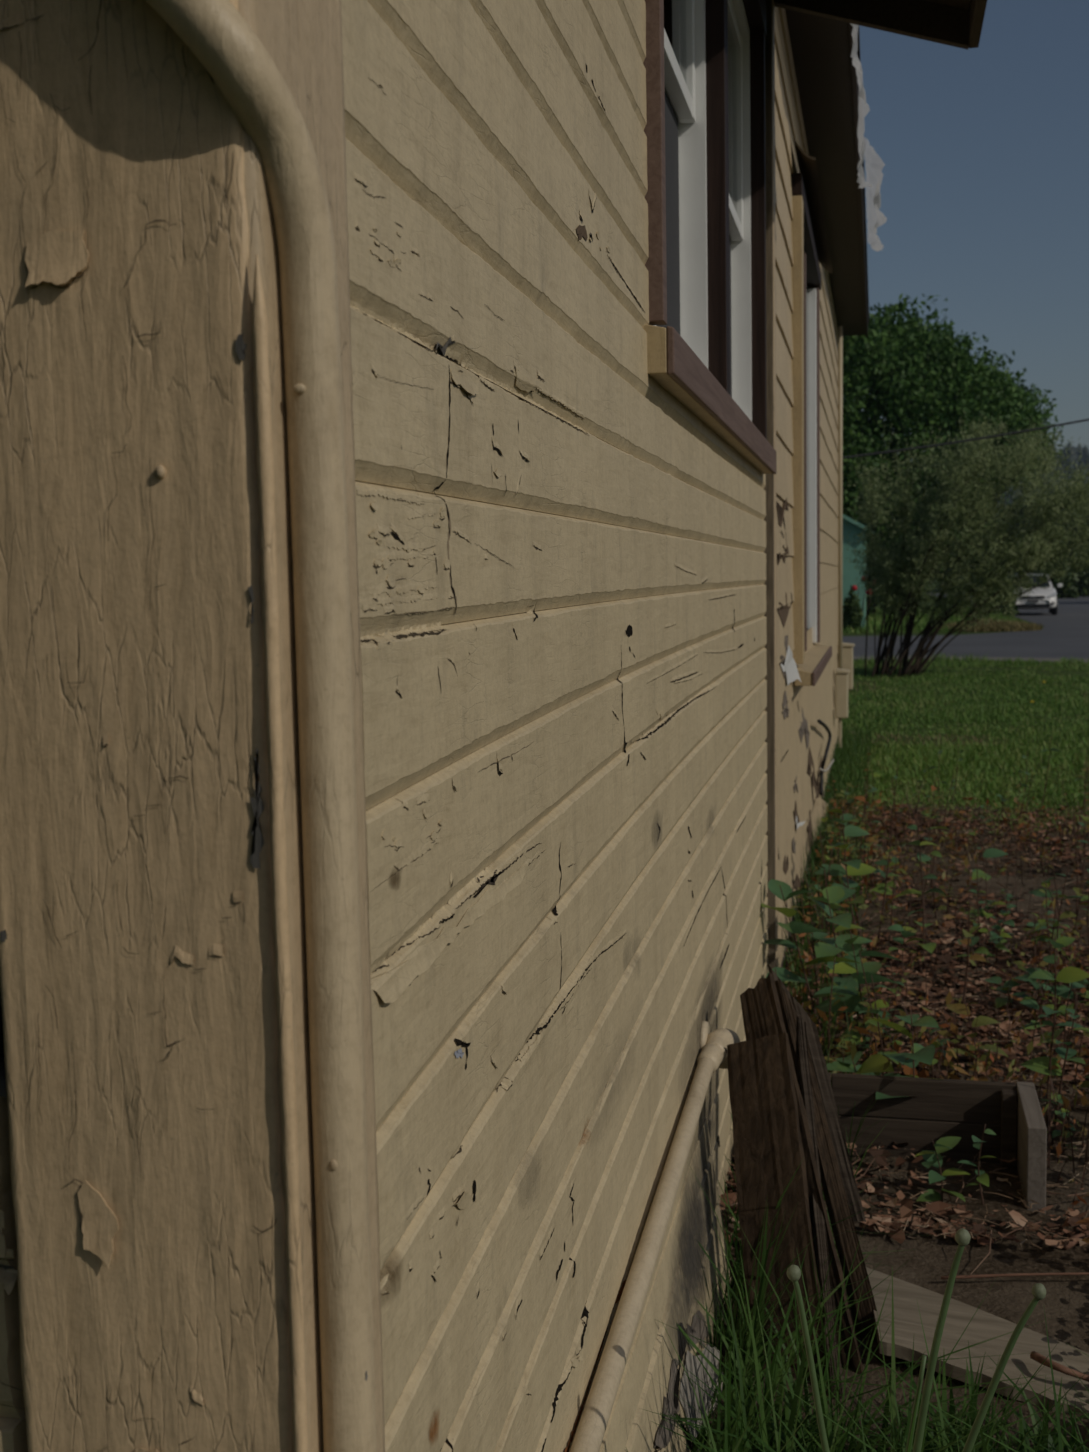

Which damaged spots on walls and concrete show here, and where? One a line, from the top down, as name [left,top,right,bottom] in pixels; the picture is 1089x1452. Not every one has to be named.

peeling [576,192,645,312]
crack [108,219,183,610]
peeling [350,300,495,406]
peeling [357,484,453,650]
peeling [371,840,545,1003]
crack [456,843,562,909]
water stain [673,1155,715,1338]